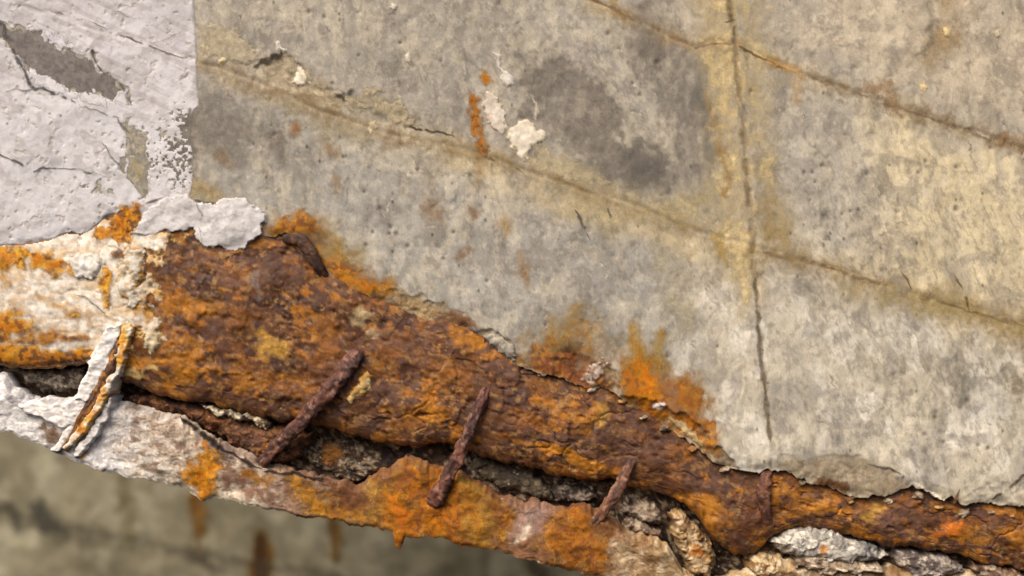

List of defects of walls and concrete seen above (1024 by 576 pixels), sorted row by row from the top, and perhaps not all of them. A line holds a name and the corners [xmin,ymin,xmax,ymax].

peeling [0,24,122,108]
spalling [254,40,352,107]
crack [674,20,786,69]
crack [409,126,453,136]
rust [468,93,488,159]
peeling [0,114,266,398]
spalling [380,295,517,362]
rust [0,202,1024,576]
spalling [581,357,611,393]
spalling [119,371,1024,576]